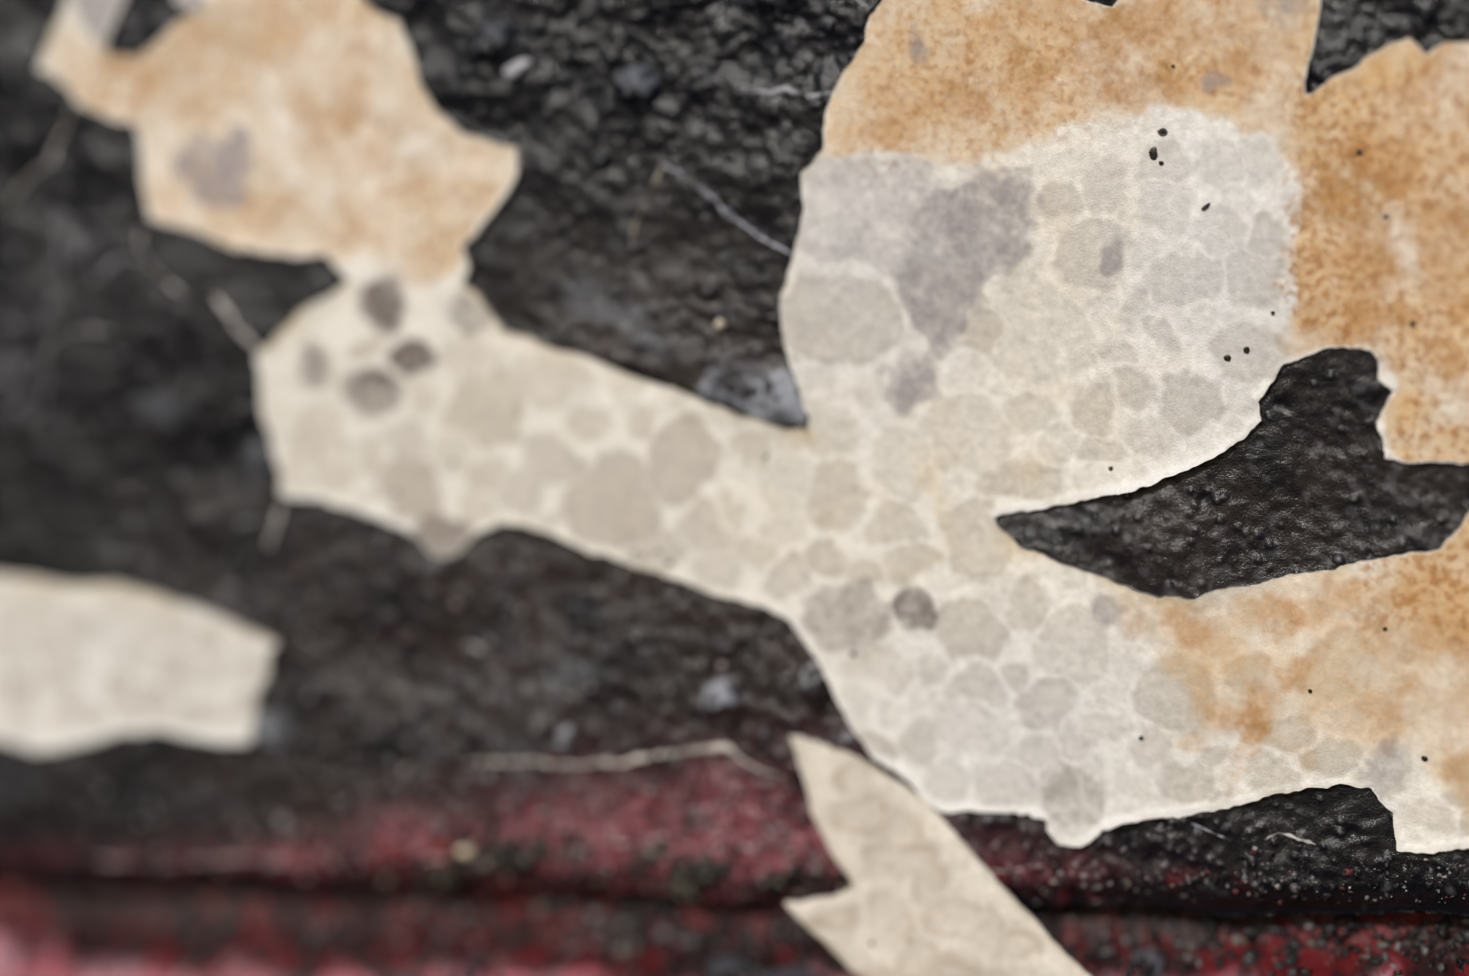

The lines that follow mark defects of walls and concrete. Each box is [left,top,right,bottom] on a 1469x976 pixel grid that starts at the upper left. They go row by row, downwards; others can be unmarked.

peeling [504,59,532,78]
rust [843,0,1081,149]
rust [1149,0,1265,115]
crack [632,163,792,255]
rust [1283,0,1469,370]
rust [1389,381,1469,463]
rust [1391,514,1469,647]
peeling [0,573,278,752]
crack [458,744,785,779]
peeling [785,735,1092,976]